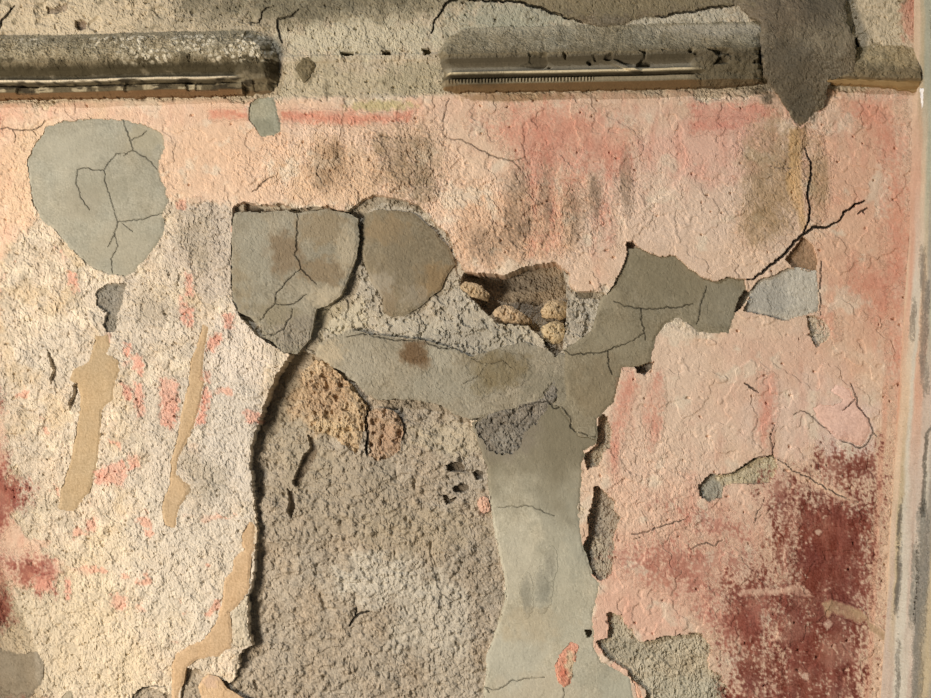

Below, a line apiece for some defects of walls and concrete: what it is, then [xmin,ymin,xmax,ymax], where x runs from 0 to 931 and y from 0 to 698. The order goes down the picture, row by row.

crack [431,0,582,33]
crack [76,120,163,273]
crack [746,148,867,280]
spalling [96,283,127,332]
peeling [204,311,276,355]
spalling [560,270,604,355]
crack [564,286,707,374]
spalling [222,197,558,698]
spalling [584,415,610,469]
spalling [583,486,621,580]
peeling [597,385,896,698]
spalling [133,668,205,698]